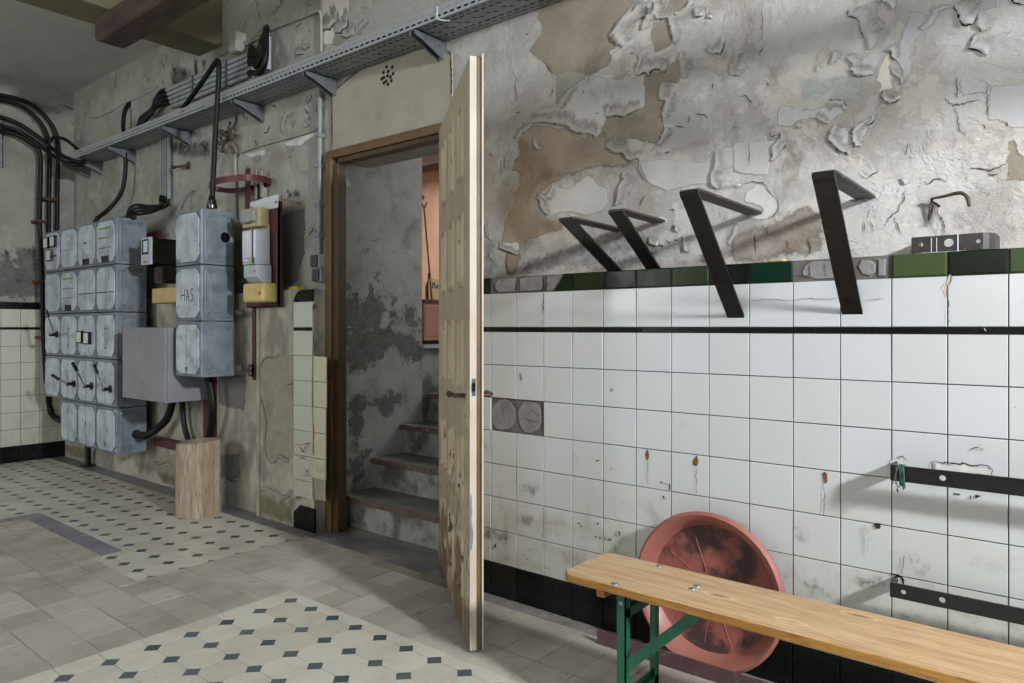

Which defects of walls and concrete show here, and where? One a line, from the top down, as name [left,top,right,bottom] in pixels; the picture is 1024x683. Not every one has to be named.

peeling [321,0,366,45]
peeling [845,0,1011,103]
peeling [494,0,874,293]
peeling [956,77,1024,181]
leakage [0,248,40,301]
peeling [857,258,886,277]
spalling [931,461,993,475]